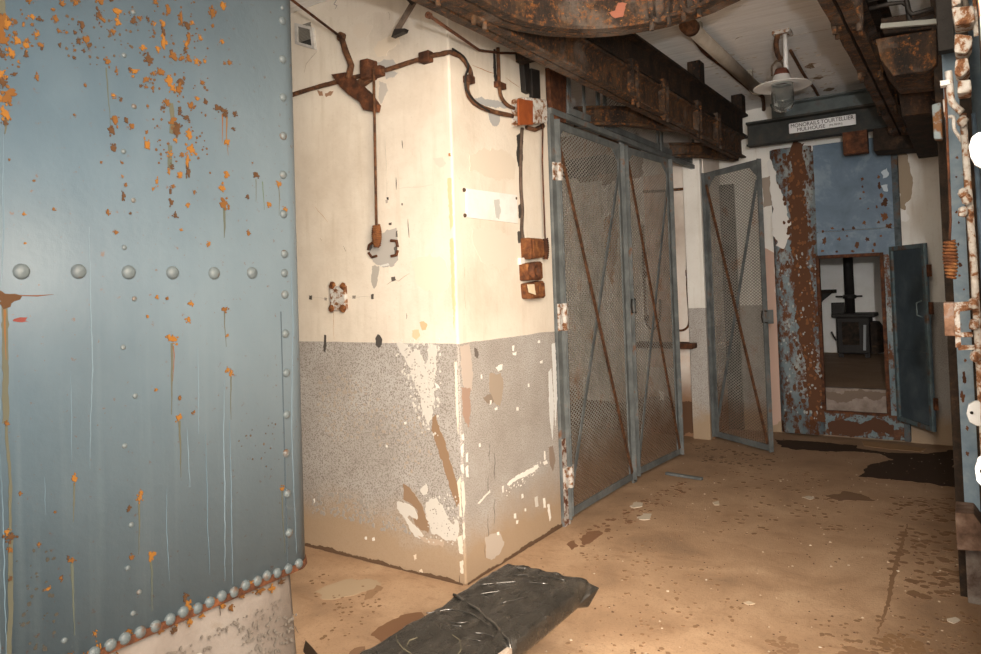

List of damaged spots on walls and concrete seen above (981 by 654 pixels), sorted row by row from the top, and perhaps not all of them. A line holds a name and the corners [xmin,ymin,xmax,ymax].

rust [251,162,288,212]
rust [779,142,894,437]
rust [0,291,77,654]
rust [126,489,156,602]
rust [165,334,195,471]
peeling [397,343,490,574]
spalling [485,532,504,560]
peeling [502,451,551,524]
peeling [540,343,558,439]
leakage [707,466,876,535]
leakage [775,439,981,654]
rust [158,593,206,635]